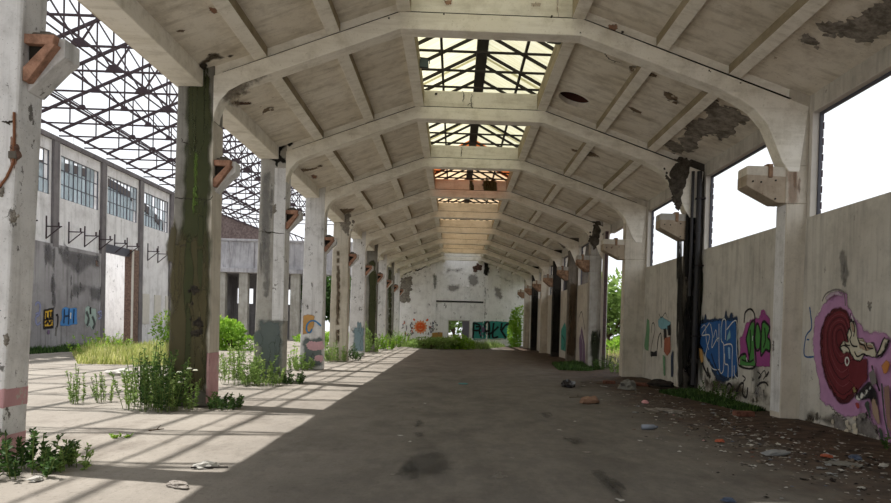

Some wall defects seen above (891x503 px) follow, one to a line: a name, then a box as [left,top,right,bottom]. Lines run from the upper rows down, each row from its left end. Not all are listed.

peeling [798,0,891,50]
leakage [188,53,233,156]
rust [0,112,17,188]
peeling [663,99,750,211]
leakage [45,245,101,308]
spalling [365,265,413,303]
leakage [840,251,848,286]